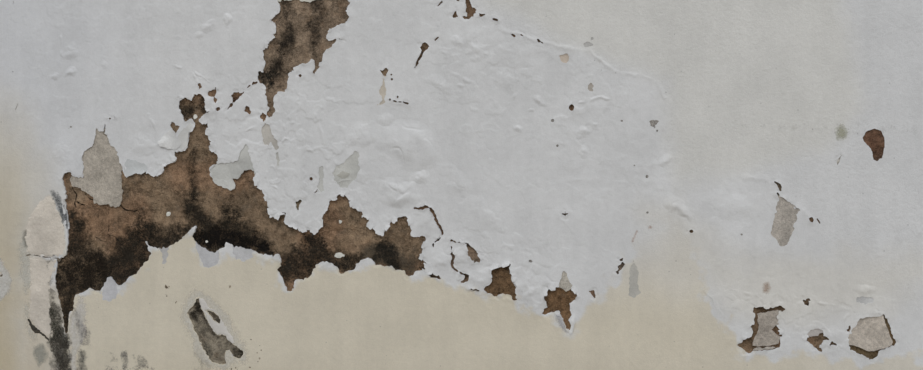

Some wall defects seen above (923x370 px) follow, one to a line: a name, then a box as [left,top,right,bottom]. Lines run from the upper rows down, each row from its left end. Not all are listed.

damp [259,1,295,89]
damp [180,97,207,119]
spalling [228,0,351,166]
spalling [863,129,885,161]
spalling [24,83,441,335]
peeling [771,195,800,246]
damp [35,149,438,370]
spalling [450,239,523,300]
spalling [542,271,596,335]
spalling [738,303,785,353]
spalling [802,329,837,352]
spalling [848,314,896,359]